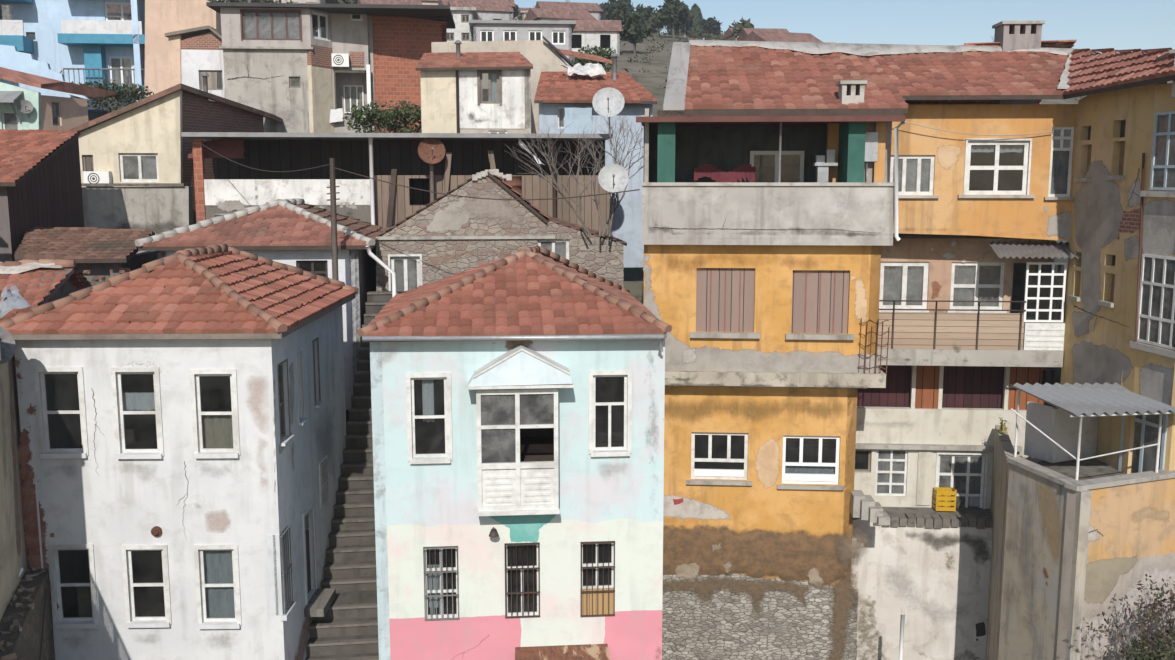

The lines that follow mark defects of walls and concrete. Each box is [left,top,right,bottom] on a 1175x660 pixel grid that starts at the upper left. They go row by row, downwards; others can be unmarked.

peeling [0,359,54,660]
spalling [663,495,731,526]